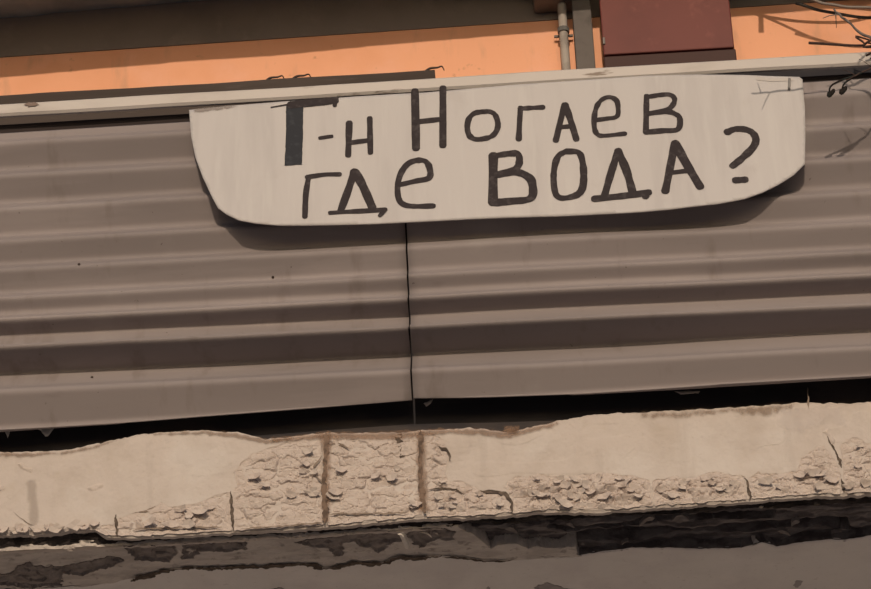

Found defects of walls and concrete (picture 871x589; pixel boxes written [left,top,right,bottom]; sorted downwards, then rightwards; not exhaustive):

spalling [0,433,871,589]
crack [827,436,845,493]